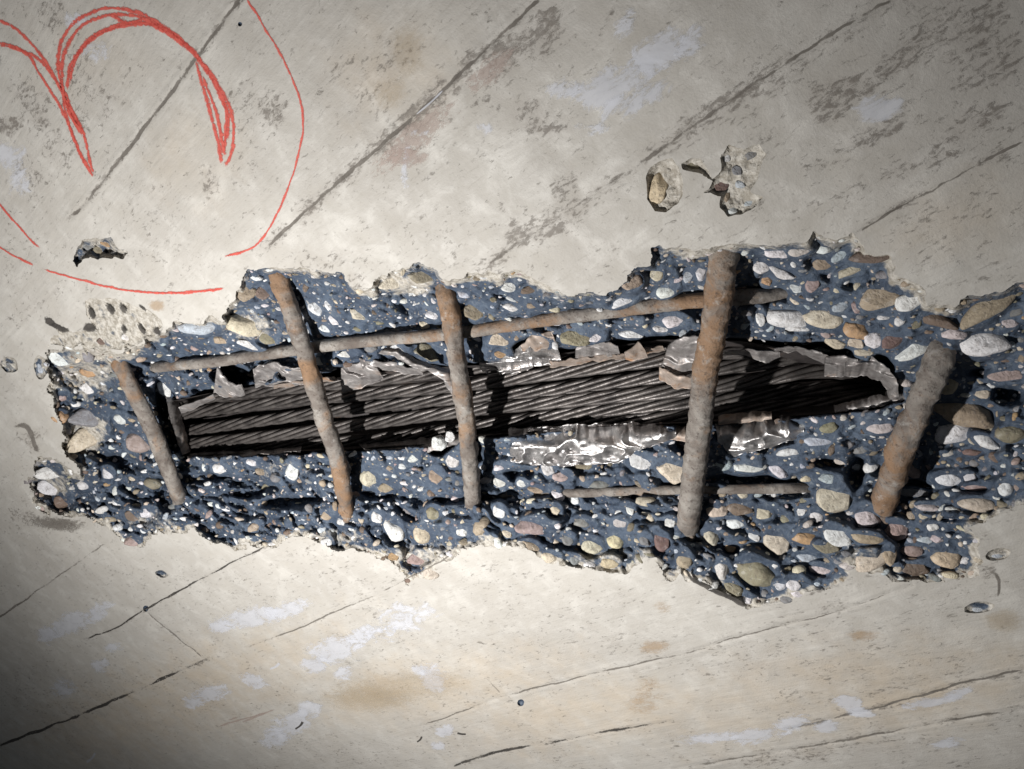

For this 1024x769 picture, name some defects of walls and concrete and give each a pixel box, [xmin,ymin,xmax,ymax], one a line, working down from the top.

crack [73,0,240,215]
crack [270,0,539,245]
spalling [16,231,1024,609]
crack [0,547,264,746]
crack [278,557,448,636]
crack [454,722,663,766]
crack [519,626,779,693]
crack [791,670,1019,748]